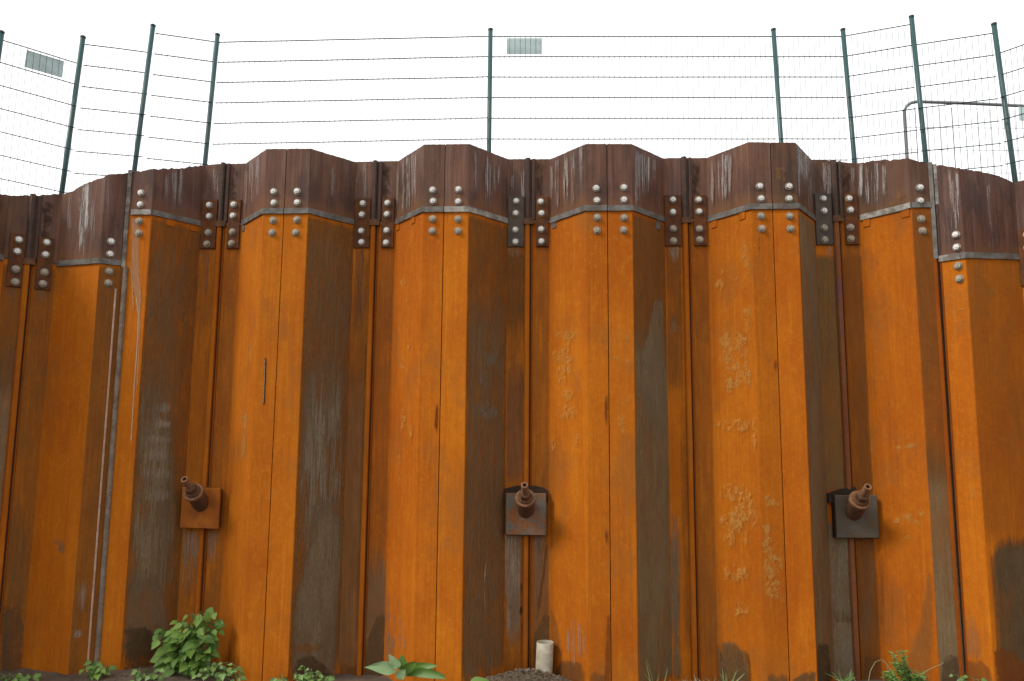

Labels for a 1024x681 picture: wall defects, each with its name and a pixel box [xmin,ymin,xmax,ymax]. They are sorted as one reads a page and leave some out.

water stain [122,220,200,659]
water stain [289,218,386,678]
water stain [633,214,681,681]
water stain [991,539,1024,681]
corrosion [994,649,1024,681]